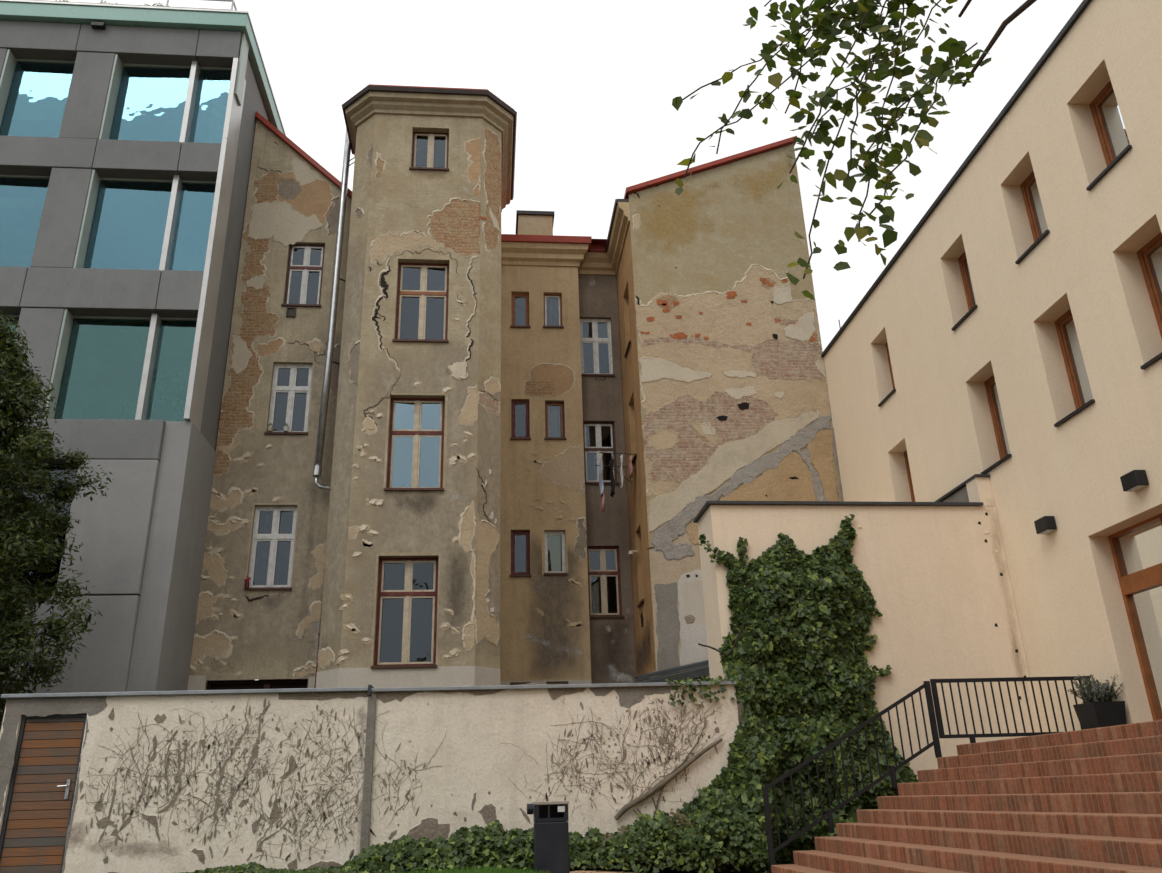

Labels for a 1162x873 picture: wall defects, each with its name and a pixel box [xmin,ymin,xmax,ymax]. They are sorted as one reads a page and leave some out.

flaking render [370,128,502,265]
crack [363,230,500,432]
flaking render [190,158,340,677]
spalling [304,338,360,397]
peeling [351,409,384,481]
spalling [635,263,841,501]
peeling [364,498,385,507]
peeling [348,524,380,559]
peeling [439,501,500,660]
flaking render [317,646,350,669]
peeling [343,623,373,644]